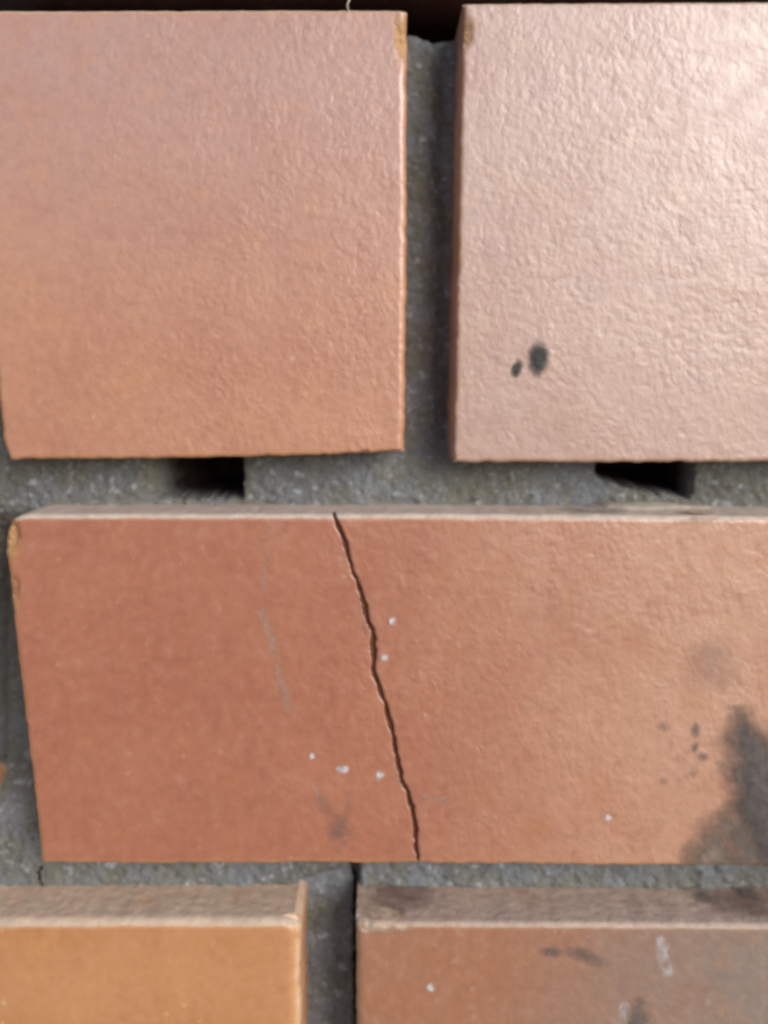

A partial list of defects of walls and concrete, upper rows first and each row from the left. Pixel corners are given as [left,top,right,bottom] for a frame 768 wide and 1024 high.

water stain [512,346,548,376]
crack [333,512,419,860]
water stain [688,714,768,866]